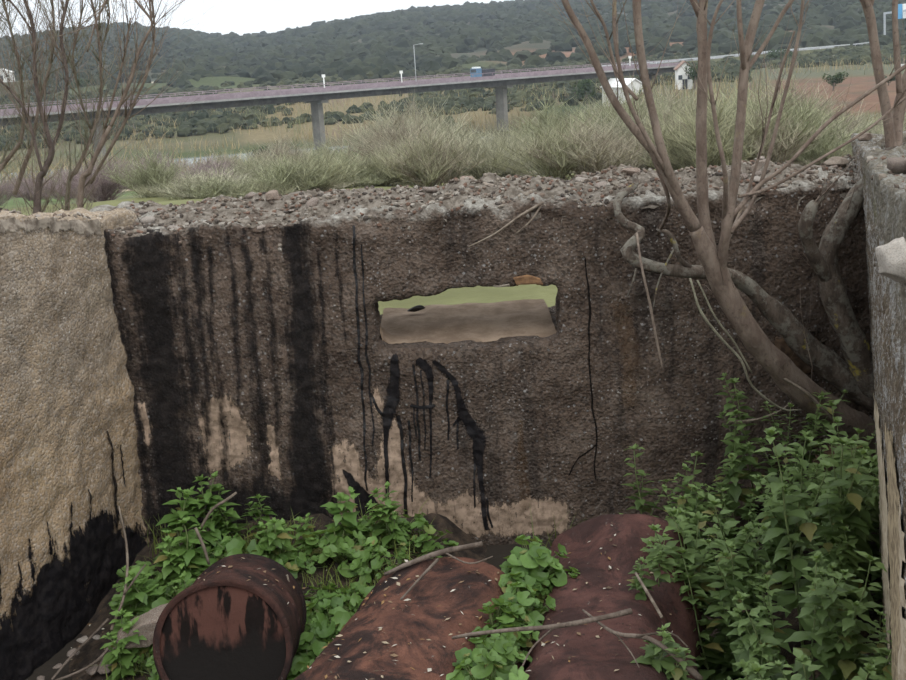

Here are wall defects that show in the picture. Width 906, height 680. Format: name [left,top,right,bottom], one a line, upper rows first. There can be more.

water stain [18,539,35,597]
water stain [104,221,337,540]
water stain [352,225,383,491]
water stain [397,365,435,515]
water stain [446,375,461,449]
crack [568,258,598,479]
spalling [873,393,906,680]